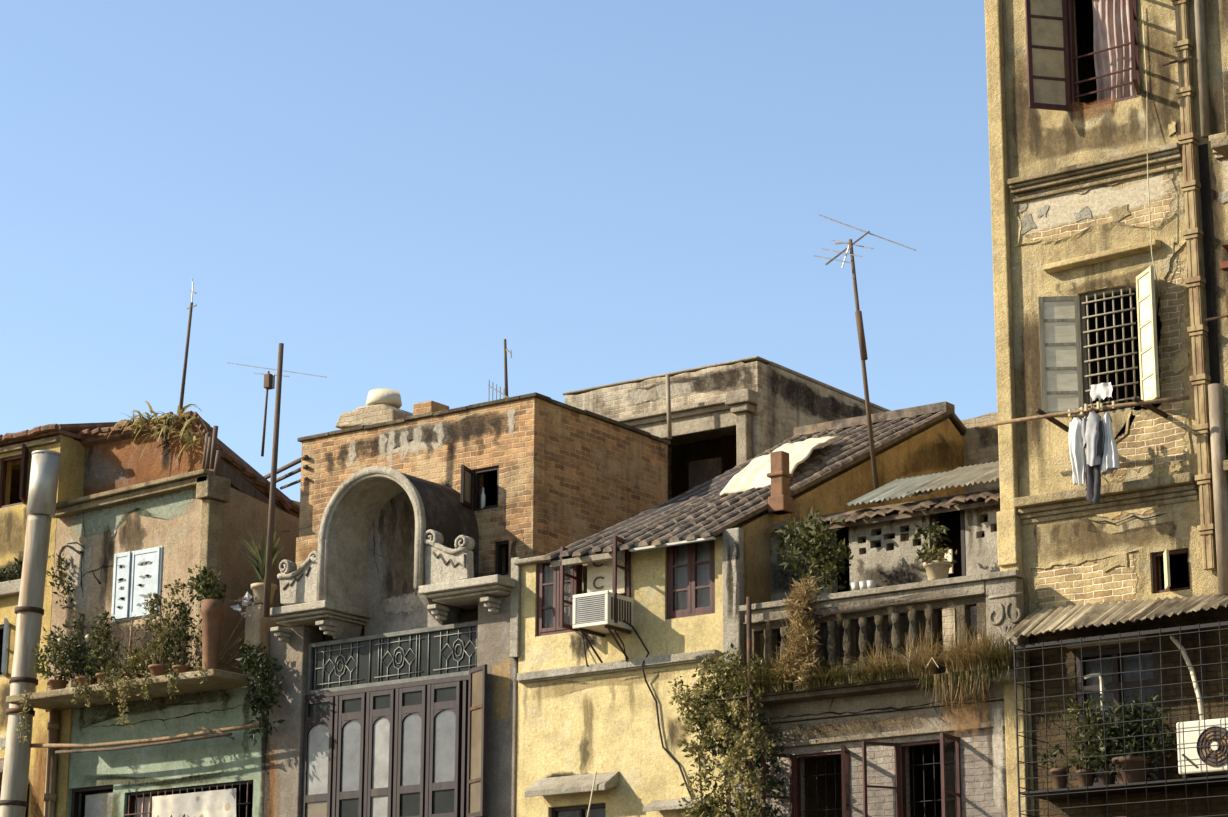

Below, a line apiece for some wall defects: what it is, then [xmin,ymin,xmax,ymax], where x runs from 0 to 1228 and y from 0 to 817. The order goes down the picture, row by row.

leakage [1014,22,1180,158]
flaking render [1011,168,1185,248]
flaking render [1101,239,1195,485]
leakage [325,409,515,468]
leakage [0,508,28,572]
flaking render [1023,546,1147,618]
leakage [571,633,602,657]